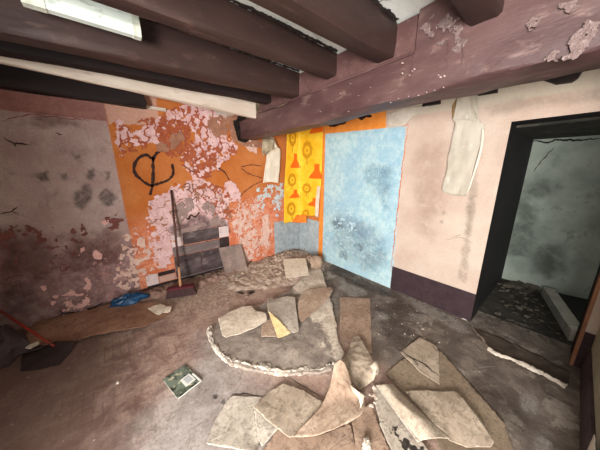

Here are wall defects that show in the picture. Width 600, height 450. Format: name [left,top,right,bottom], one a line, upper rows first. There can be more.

peeling [558,0,580,14]
peeling [420,10,468,53]
peeling [544,19,600,62]
crack [533,138,600,171]
peeling [112,104,284,269]
flaking render [0,224,103,272]
flaking render [101,214,124,243]
peeling [50,277,92,316]